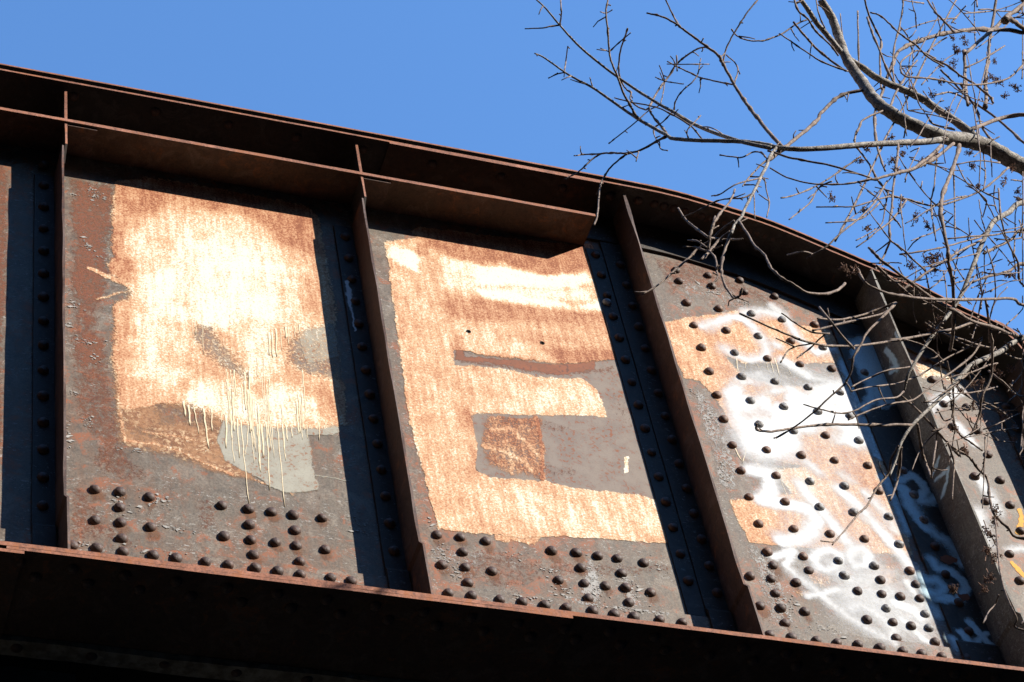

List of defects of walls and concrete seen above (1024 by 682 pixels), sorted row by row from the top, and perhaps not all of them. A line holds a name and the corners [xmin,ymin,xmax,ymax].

rust [0,166,8,372]
rust [69,179,253,480]
rust [454,350,614,375]
rust [481,415,572,481]
rust [438,535,668,605]
rust [871,566,921,592]